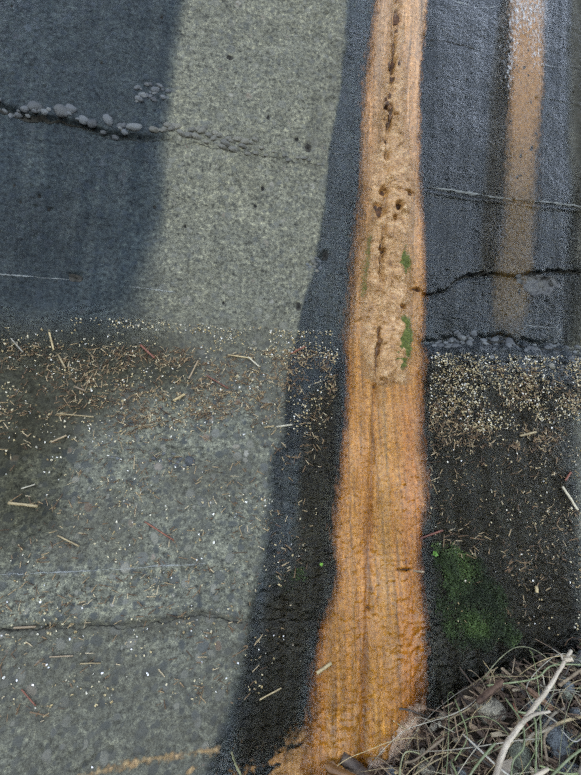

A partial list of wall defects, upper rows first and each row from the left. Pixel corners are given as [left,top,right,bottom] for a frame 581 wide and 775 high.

water stain [215,185,362,775]
rust [269,0,430,775]
crack [372,327,384,389]
crack [373,191,411,219]
crack [384,0,401,145]
water stain [408,0,578,747]
crack [411,270,581,294]
rust [495,0,547,320]